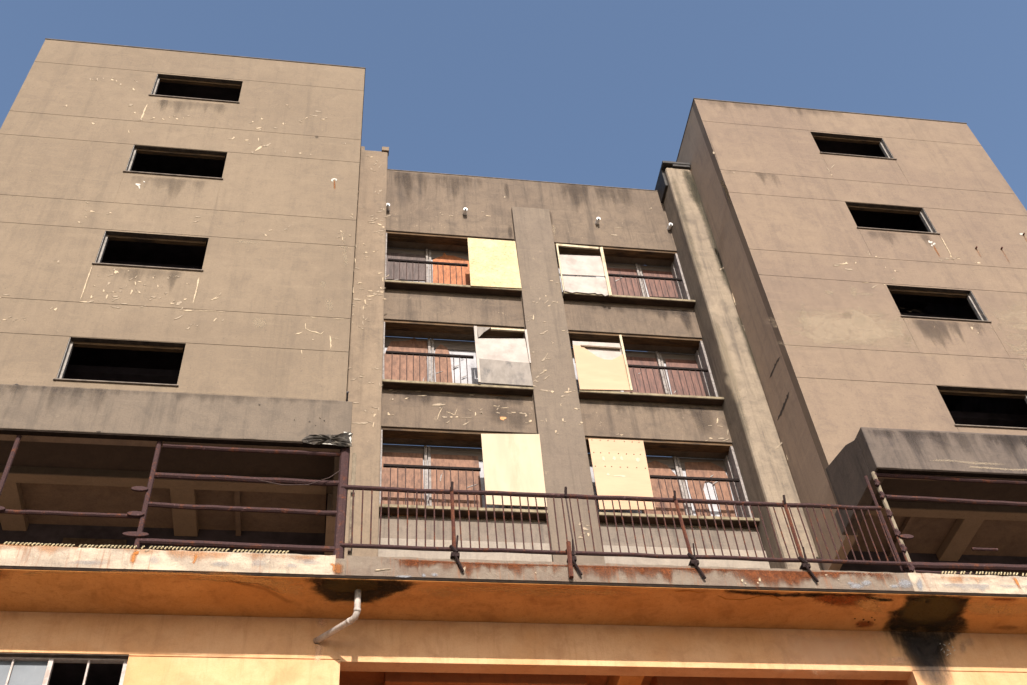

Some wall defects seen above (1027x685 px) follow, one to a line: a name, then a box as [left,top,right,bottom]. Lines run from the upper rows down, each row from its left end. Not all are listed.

peeling [79,267,224,330]
peeling [437,405,583,434]
rust [400,559,850,585]
water stain [311,577,412,602]
water stain [728,574,969,682]